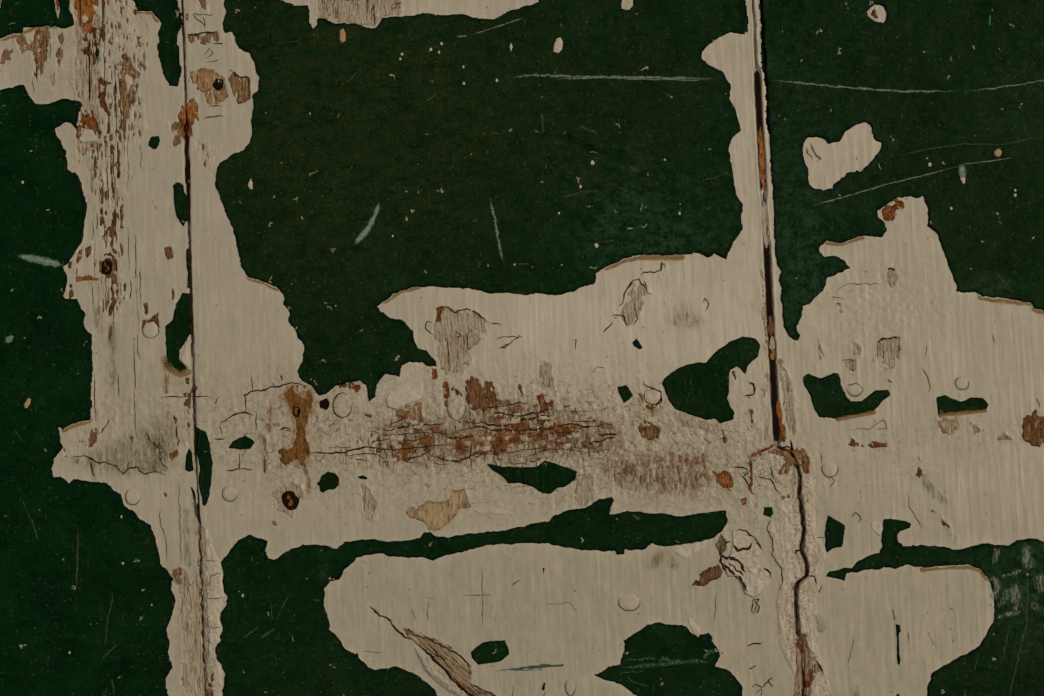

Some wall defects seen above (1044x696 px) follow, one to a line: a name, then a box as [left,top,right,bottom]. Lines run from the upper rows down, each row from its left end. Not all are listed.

peeling [283,0,539,42]
peeling [621,0,633,10]
crack [752,0,766,203]
peeling [803,122,881,190]
crack [604,263,666,332]
crack [425,306,521,369]
crack [842,336,931,391]
crack [314,402,617,471]
crack [708,245,835,696]
peeling [870,520,882,537]
peeling [166,575,198,696]
peeling [810,681,827,696]